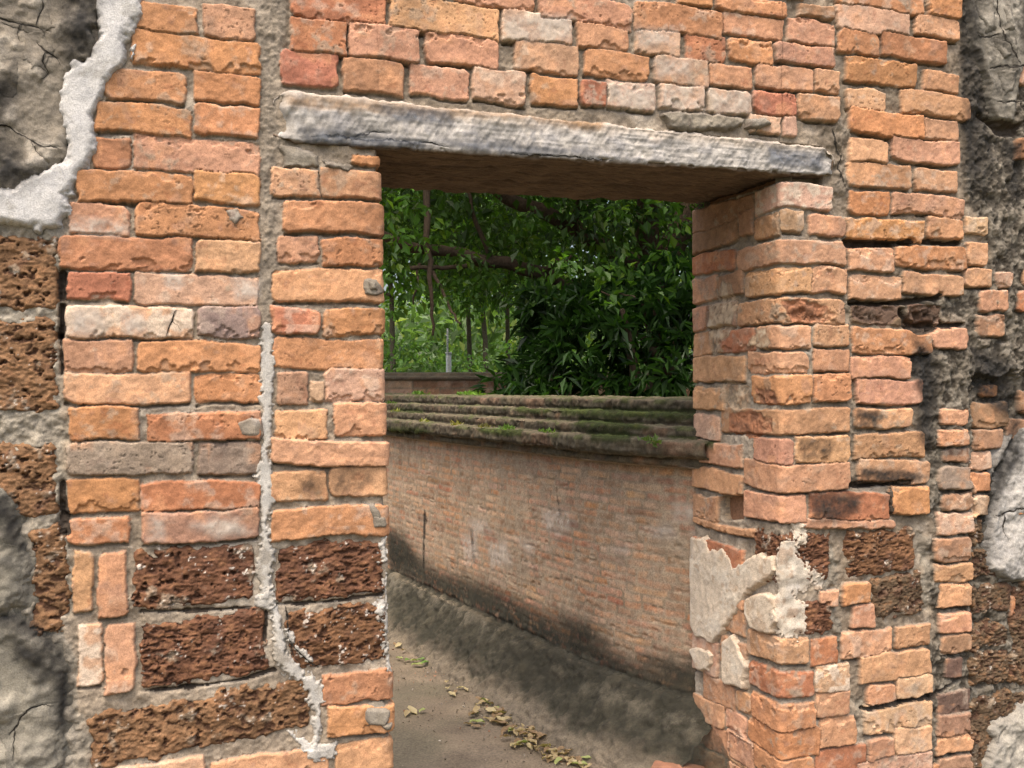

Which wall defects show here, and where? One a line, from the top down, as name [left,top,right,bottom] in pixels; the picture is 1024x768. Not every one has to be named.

crack [0,124,59,161]
crack [0,1,60,82]
peeling [0,0,97,235]
leakage [365,511,729,768]
peeling [689,522,825,690]